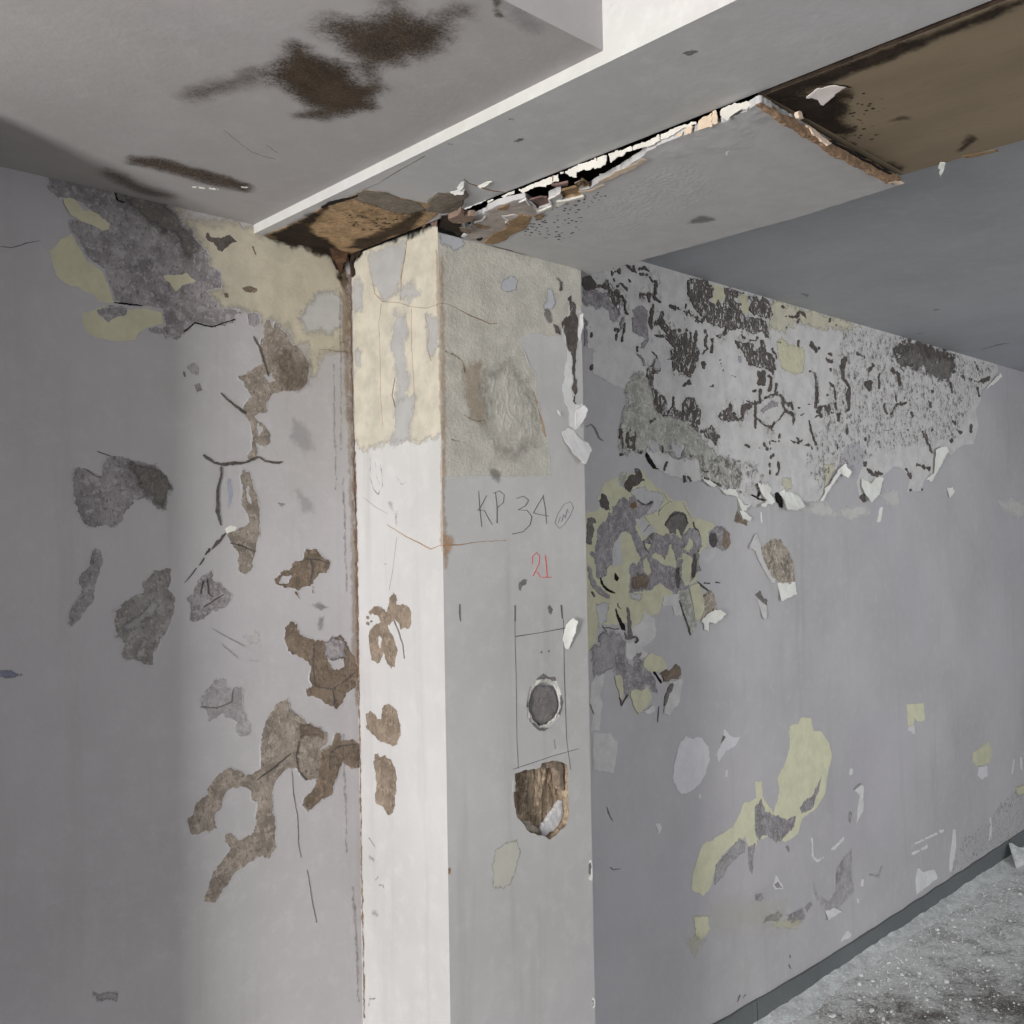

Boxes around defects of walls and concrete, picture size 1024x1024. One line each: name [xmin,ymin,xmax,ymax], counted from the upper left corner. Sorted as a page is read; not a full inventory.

leakage [194,0,466,121]
leakage [766,0,1024,153]
leakage [129,156,251,191]
leakage [265,207,423,288]
spalling [44,177,312,576]
peeling [544,261,1002,722]
crack [184,533,227,583]
spalling [111,566,234,668]
spalling [282,619,358,712]
spalling [366,591,413,671]
spalling [183,674,359,906]
spalling [513,760,569,839]